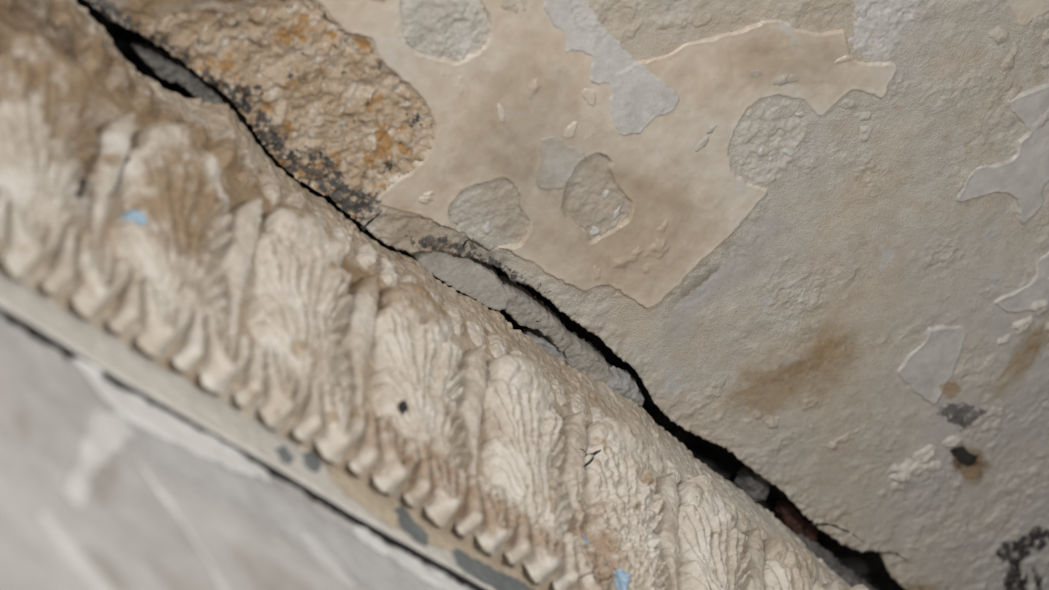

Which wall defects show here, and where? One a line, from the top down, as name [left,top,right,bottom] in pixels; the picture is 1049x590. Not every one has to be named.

peeling [114,0,921,308]
peeling [956,83,1049,224]
crack [76,0,908,590]
peeling [993,252,1049,313]
peeling [897,325,967,404]
crack [0,307,487,590]
damp [938,401,985,432]
rust [954,449,988,480]
damp [996,526,1049,590]